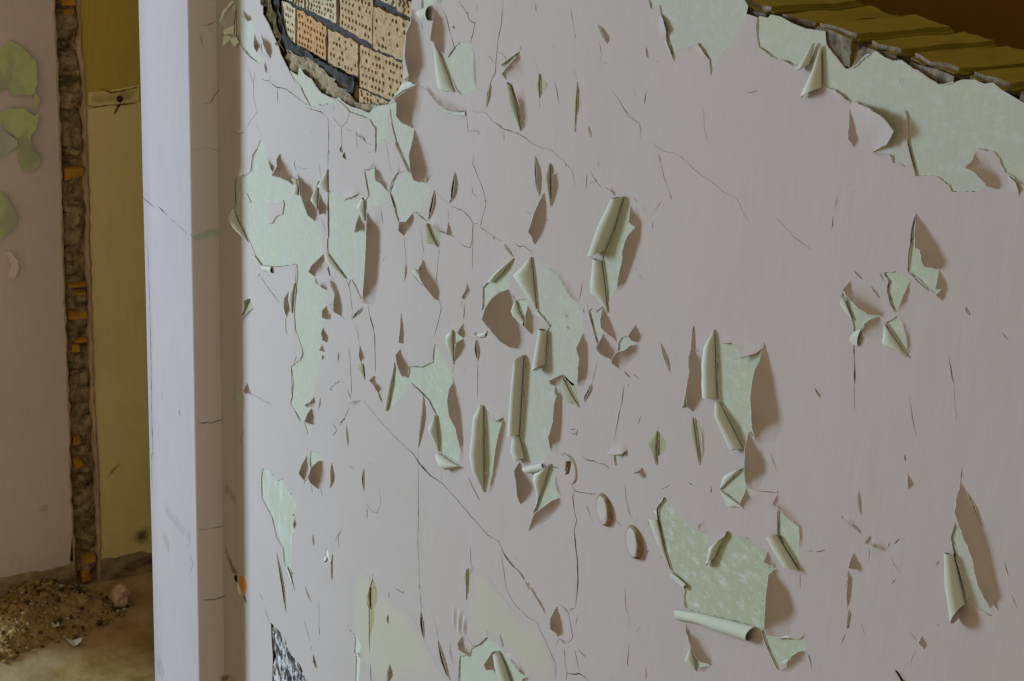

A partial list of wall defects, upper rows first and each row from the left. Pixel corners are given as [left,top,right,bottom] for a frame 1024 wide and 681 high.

spalling [53,0,102,586]
peeling [189,0,478,433]
crack [438,157,530,252]
peeling [359,184,642,531]
crack [461,5,600,186]
crack [615,93,750,227]
peeling [649,0,1024,196]
peeling [840,214,947,358]
spalling [272,624,307,681]
crack [329,279,588,681]
crack [572,486,595,626]
peeling [648,326,811,673]